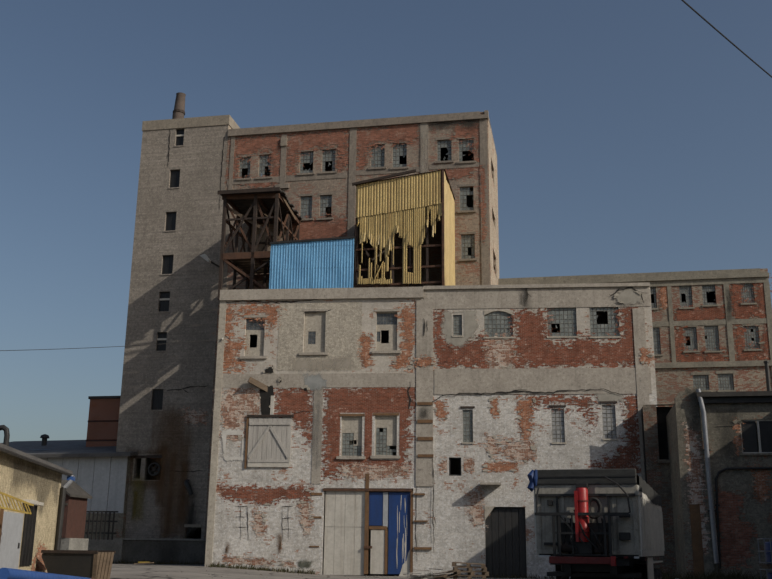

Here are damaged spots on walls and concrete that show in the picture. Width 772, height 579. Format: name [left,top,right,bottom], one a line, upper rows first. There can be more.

flaking render [211,289,655,540]
crack [432,389,624,402]
flaking render [679,422,711,556]